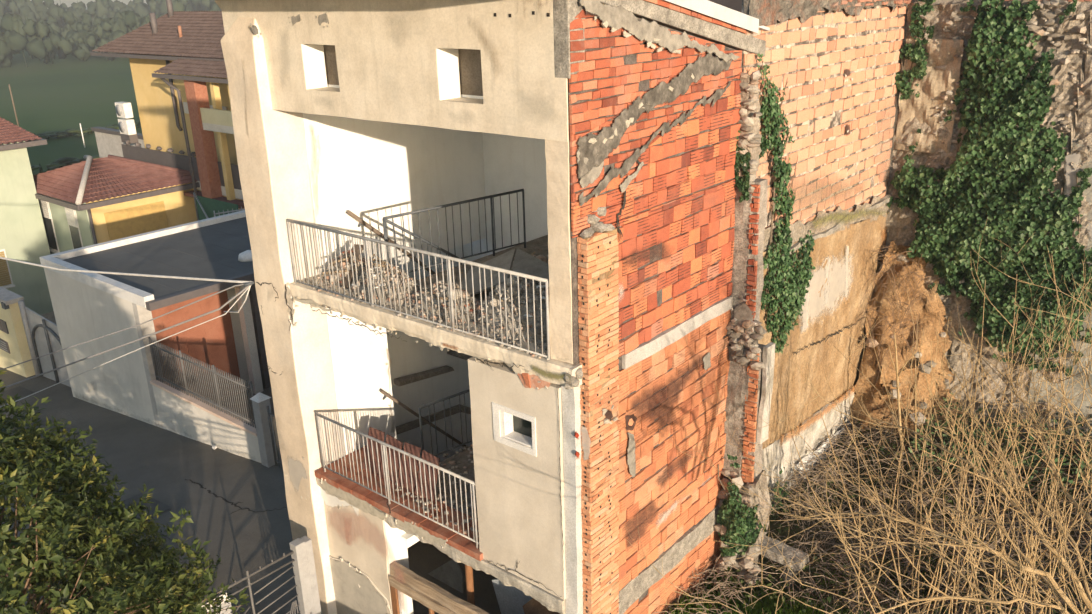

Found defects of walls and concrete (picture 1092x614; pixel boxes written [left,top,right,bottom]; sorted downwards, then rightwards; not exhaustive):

flaking render [580,0,740,62]
peeling [589,102,645,144]
flaking render [515,372,550,390]
crack [185,479,286,514]
spalling [287,457,448,548]